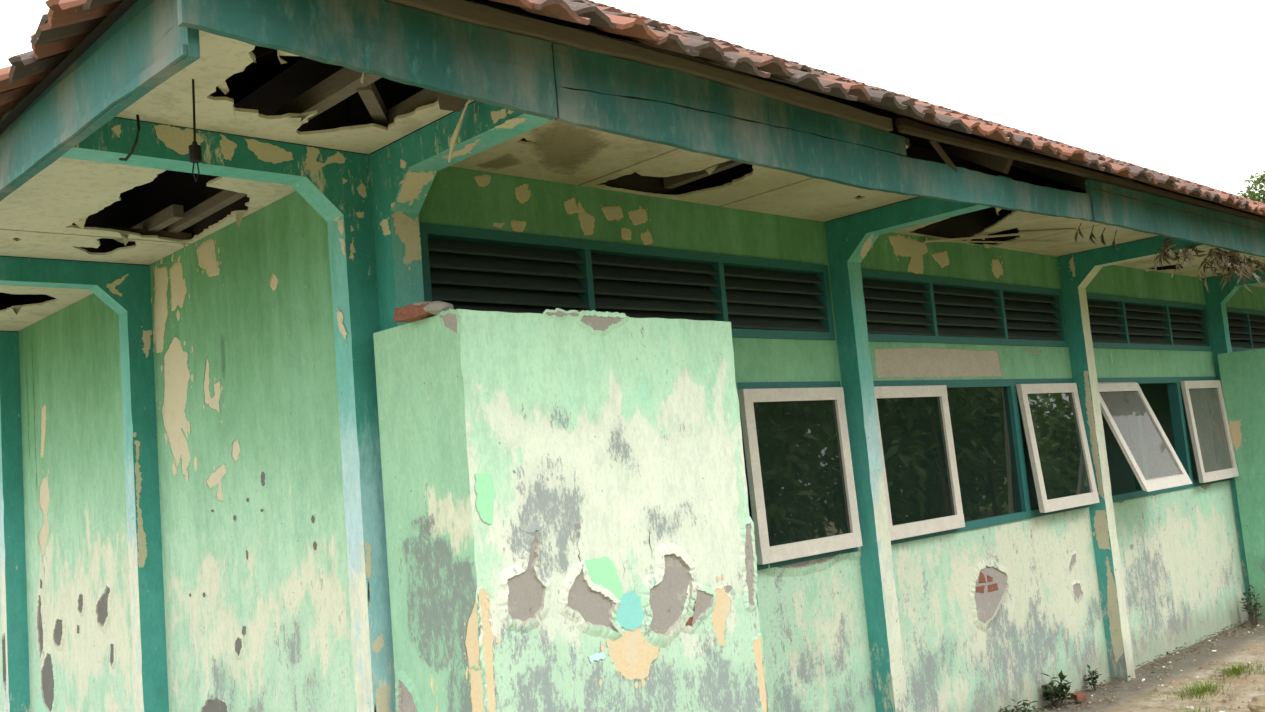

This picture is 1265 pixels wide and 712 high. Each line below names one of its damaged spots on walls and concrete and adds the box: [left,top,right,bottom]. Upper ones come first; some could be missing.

peeling [153,124,204,155]
peeling [220,134,368,259]
peeling [380,108,527,276]
peeling [515,184,532,204]
peeling [564,198,655,245]
peeling [107,274,129,296]
peeling [336,309,347,346]
peeling [140,238,242,513]
spalling [36,405,116,712]
spalling [462,516,861,712]
spalling [969,559,1009,632]
spalling [197,688,234,712]